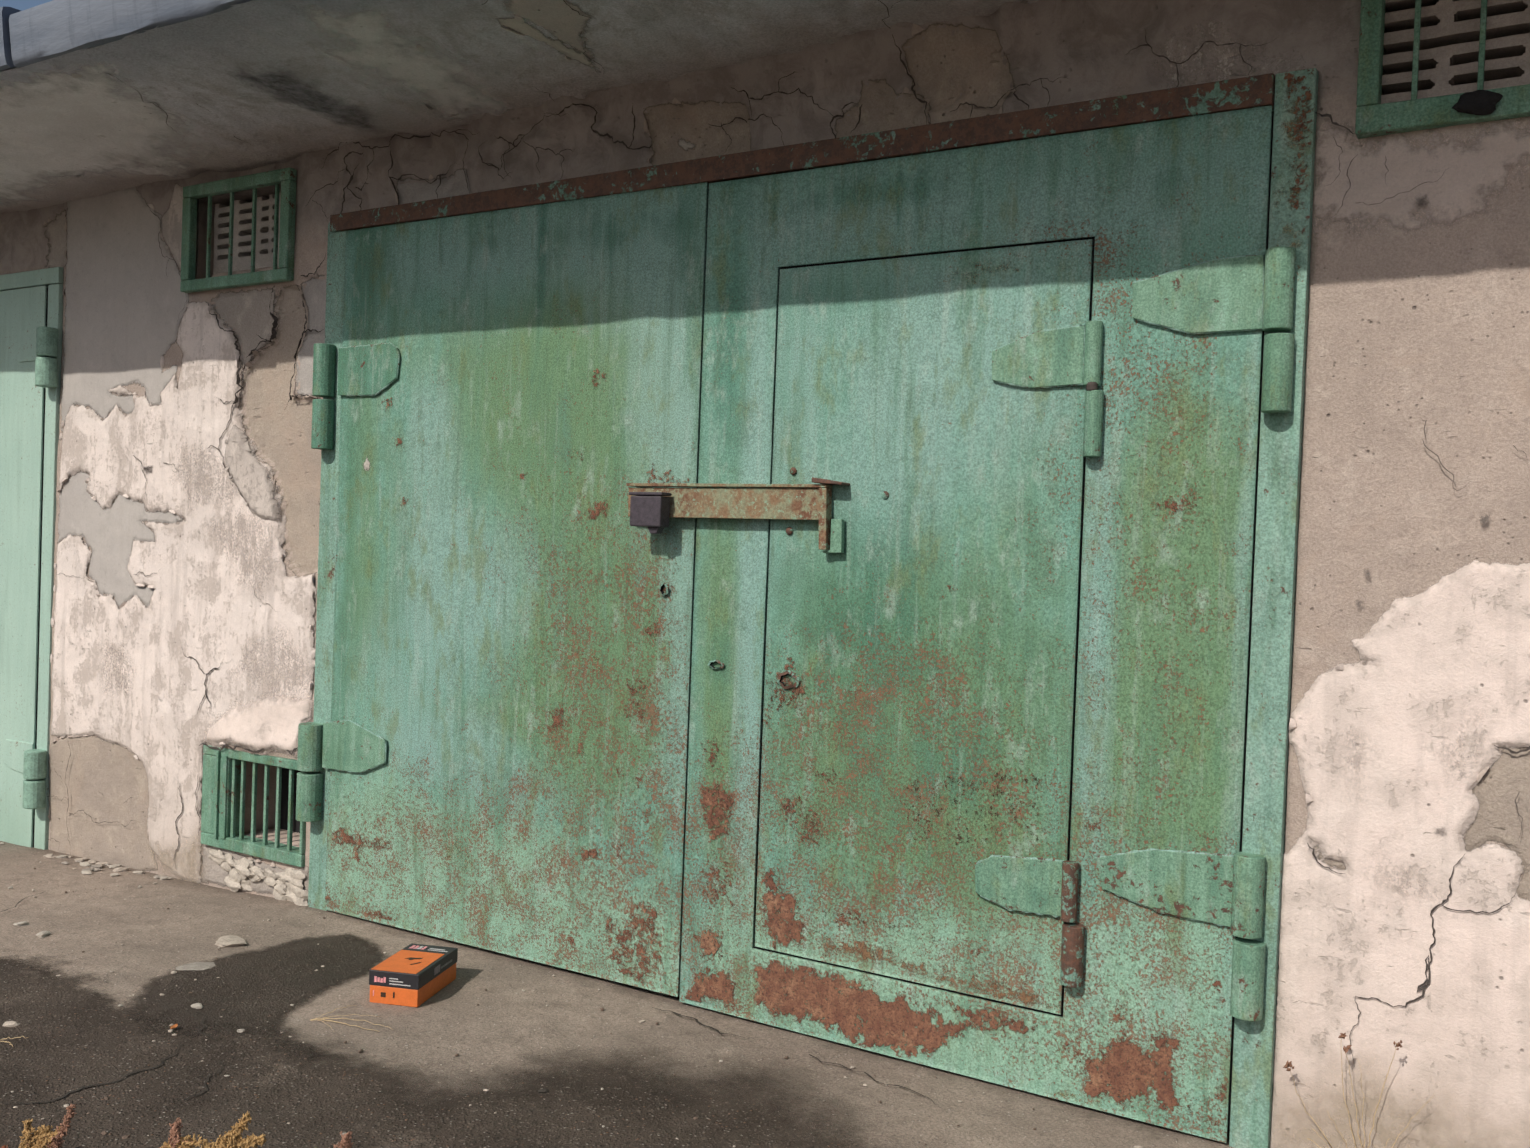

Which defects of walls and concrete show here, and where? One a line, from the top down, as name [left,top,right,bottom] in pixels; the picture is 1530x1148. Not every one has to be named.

peeling [503,0,594,62]
crack [709,71,862,148]
crack [878,0,1068,125]
crack [147,88,656,515]
peeling [0,66,326,894]
crack [47,649,298,874]
corrosion [685,870,1060,1061]
peeling [1270,560,1530,1148]
crack [1349,791,1529,1069]
crack [1494,745,1530,754]
corrosion [1057,1003,1227,1128]